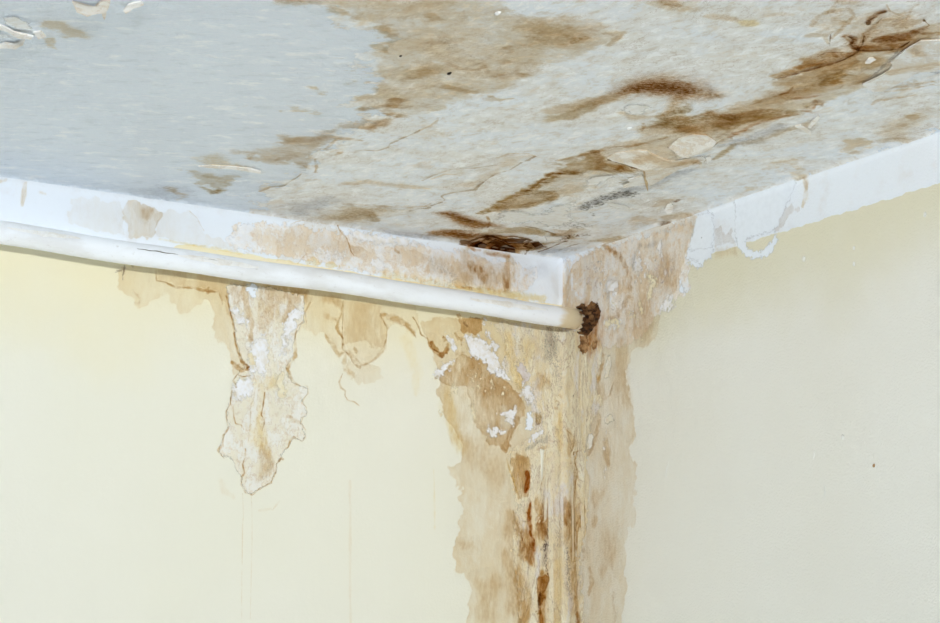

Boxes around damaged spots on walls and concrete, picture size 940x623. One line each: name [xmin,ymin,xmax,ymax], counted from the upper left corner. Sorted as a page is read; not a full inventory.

peeling [0,16,46,50]
peeling [72,0,110,20]
water stain [624,83,718,96]
water stain [432,191,634,241]
water stain [686,210,714,270]
water stain [734,180,797,259]
water stain [246,283,258,298]
water stain [229,304,303,402]
water stain [432,317,544,444]
peeling [198,0,940,623]
corrosion [576,301,601,354]
water stain [603,239,685,341]